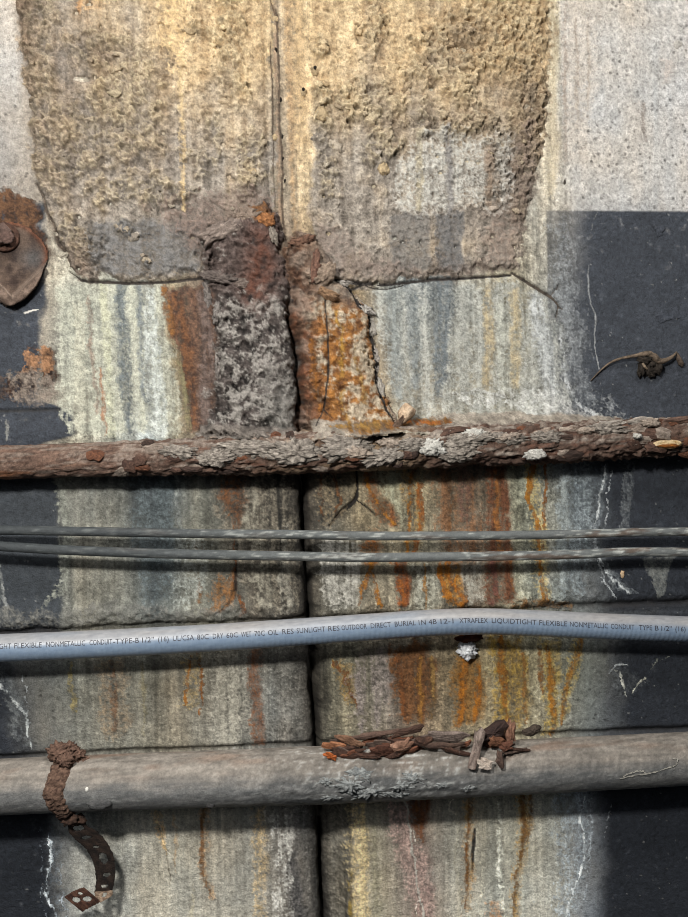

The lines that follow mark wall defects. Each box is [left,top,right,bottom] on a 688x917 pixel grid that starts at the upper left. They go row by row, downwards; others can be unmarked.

rust [0,183,57,258]
flaking render [13,0,283,287]
crack [269,0,288,247]
flaking render [305,0,560,292]
rust [0,344,61,410]
leakage [50,276,185,440]
rust [160,283,215,434]
crack [347,470,376,514]
rust [325,416,455,436]
rust [357,463,574,612]
rust [387,635,585,770]
rust [458,794,536,917]